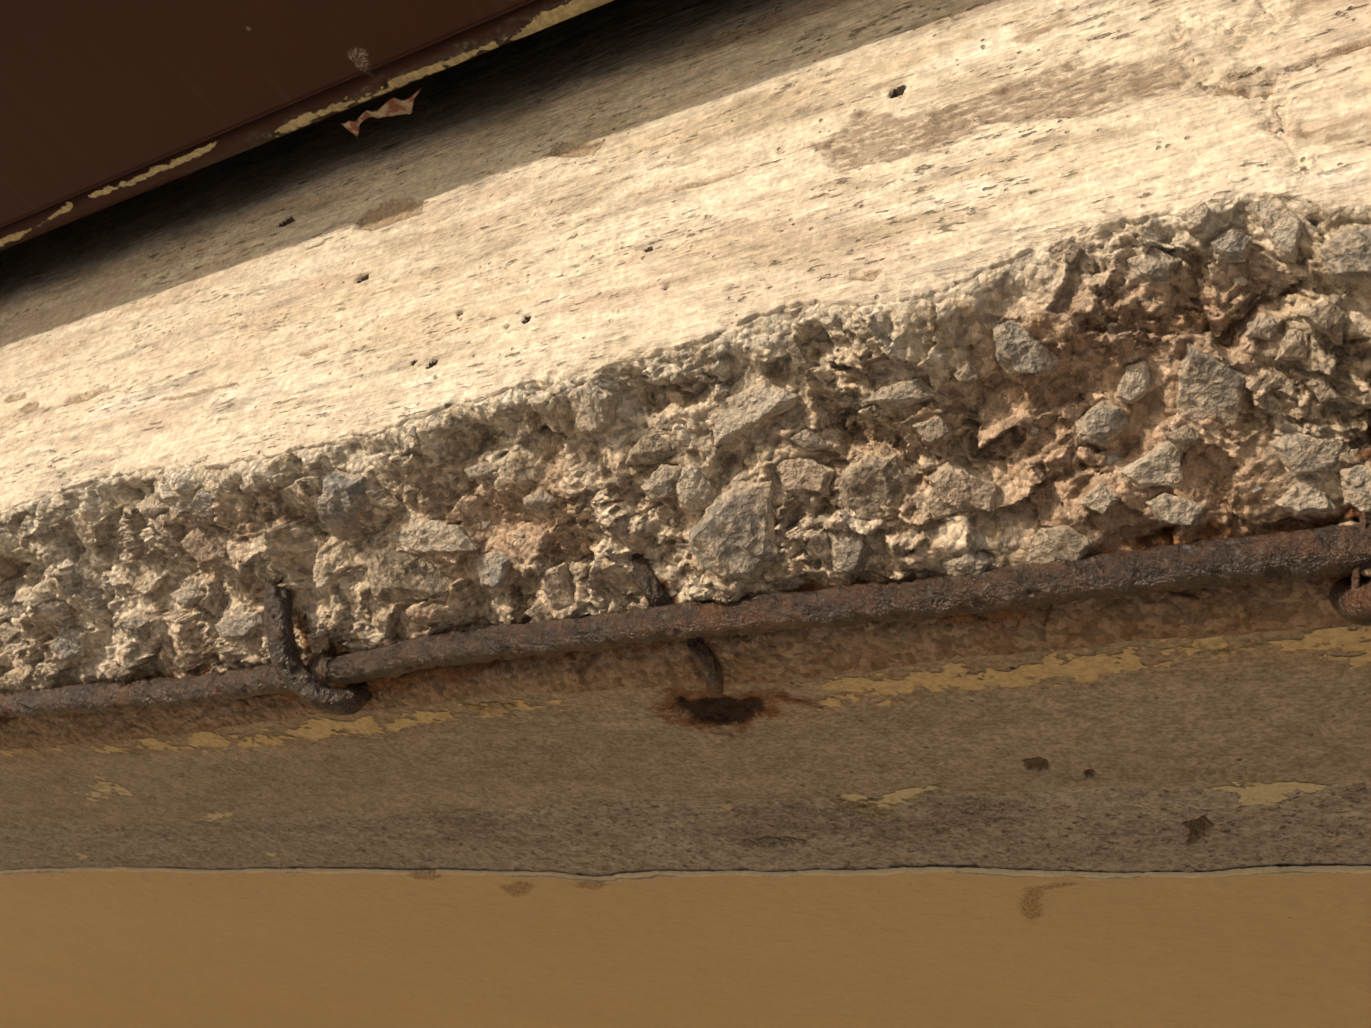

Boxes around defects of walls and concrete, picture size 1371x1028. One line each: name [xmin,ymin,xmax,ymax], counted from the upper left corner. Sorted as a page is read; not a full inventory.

peeling [341,88,422,137]
spalling [813,61,1188,172]
spalling [1216,86,1272,100]
spalling [549,141,605,158]
spalling [0,193,1371,711]
rust [1086,506,1360,555]
rust [794,579,890,592]
rust [294,609,349,658]
spalling [0,692,327,750]
rust [650,687,816,738]
spalling [1023,757,1048,772]
spalling [1183,816,1213,844]